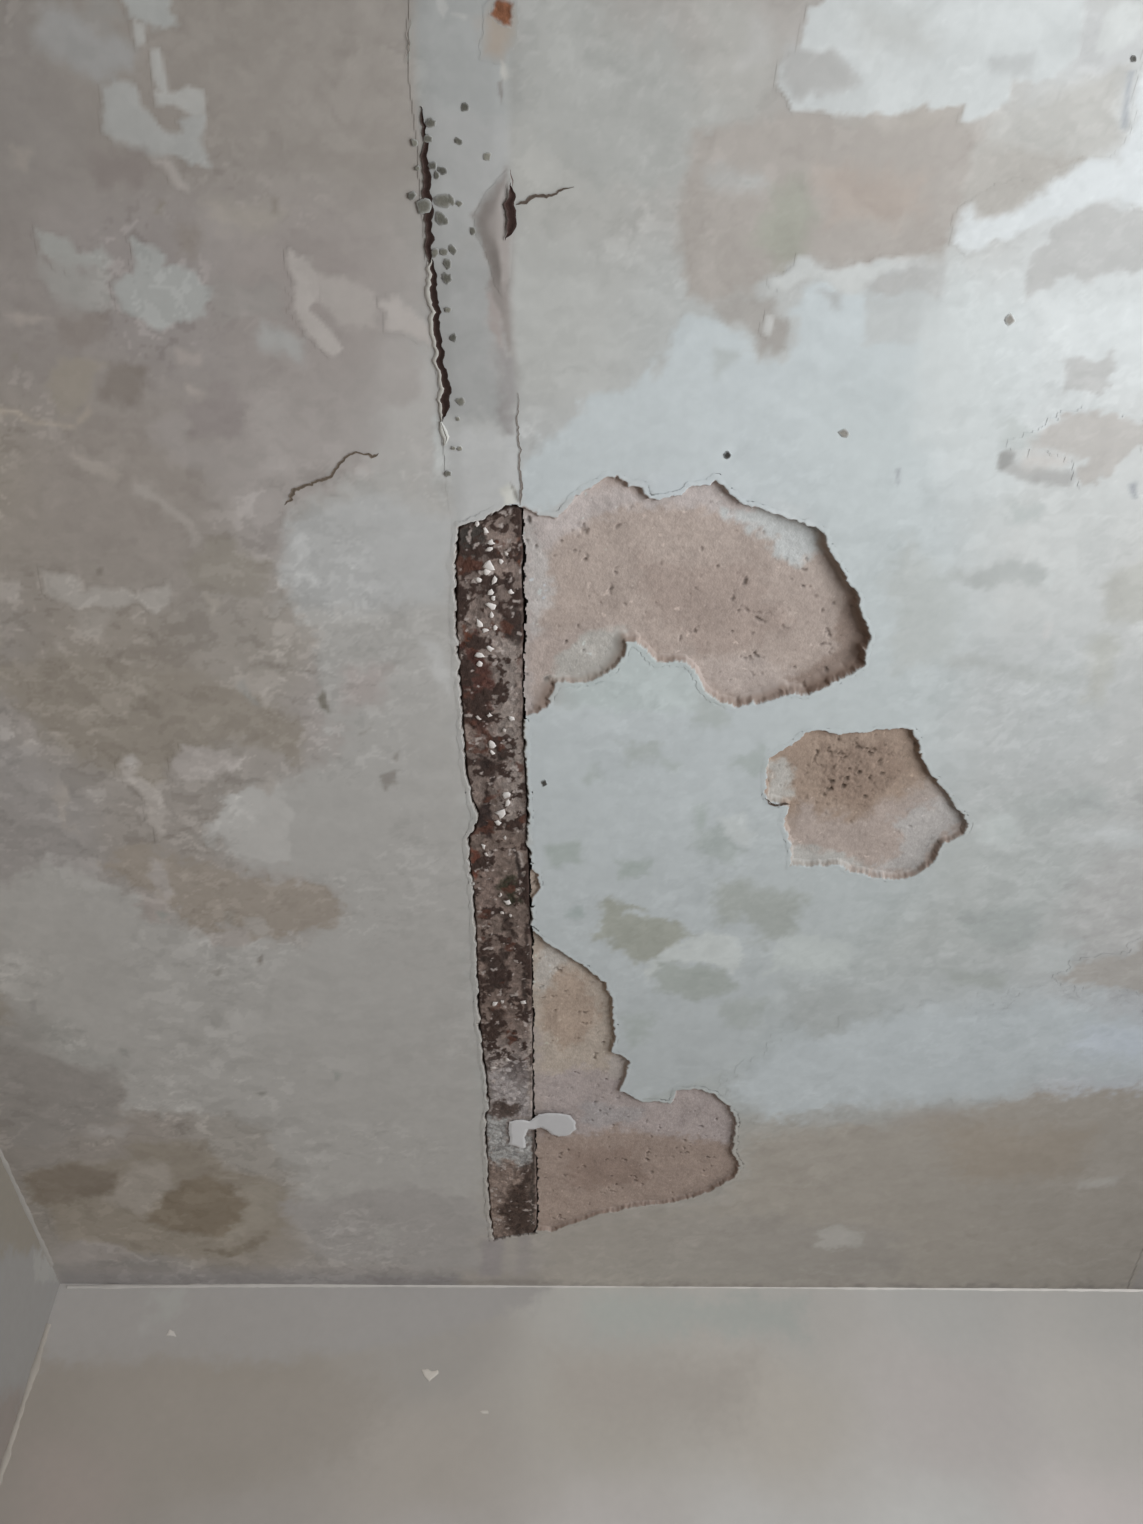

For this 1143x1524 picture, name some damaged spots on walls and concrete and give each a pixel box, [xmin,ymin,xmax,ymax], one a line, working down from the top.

crack [504,170,573,240]
peeling [30,223,221,336]
crack [421,107,452,446]
crack [285,451,379,505]
peeling [0,246,1143,1244]
damp [0,1133,294,1262]